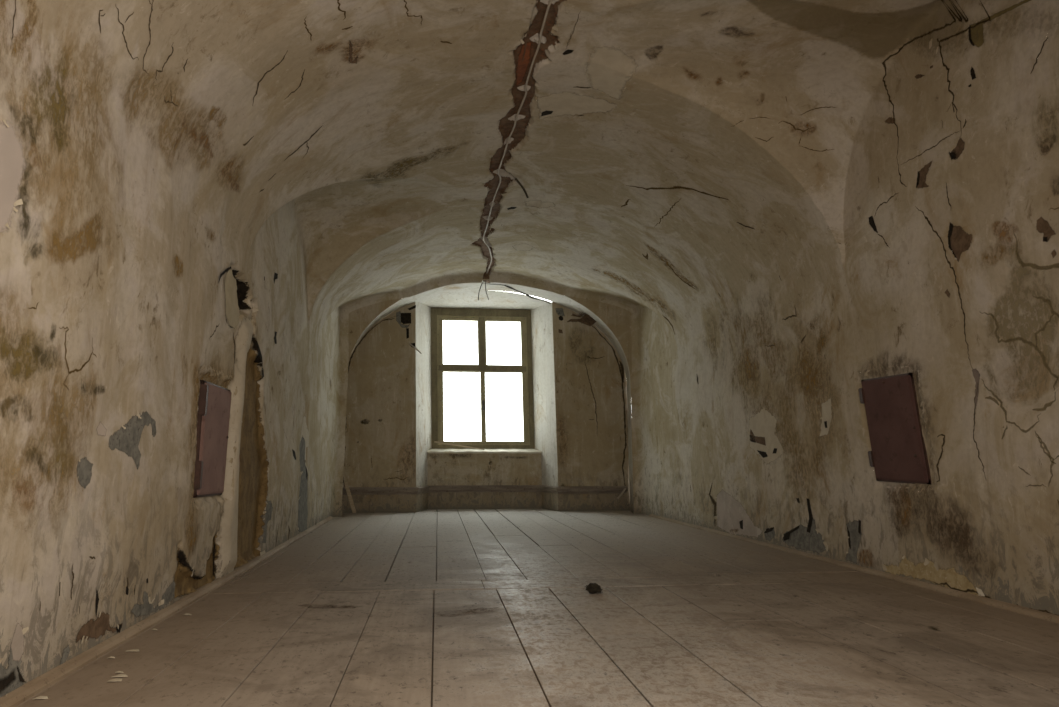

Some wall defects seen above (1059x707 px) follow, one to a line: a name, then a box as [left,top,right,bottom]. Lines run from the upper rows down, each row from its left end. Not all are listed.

crack [99,0,188,106]
peeling [0,119,25,232]
water stain [127,74,241,183]
flaking render [472,0,574,283]
flaking render [232,270,258,319]
crack [874,0,990,482]
water stain [0,297,104,506]
peeling [97,410,156,469]
flaking render [234,335,274,569]
peeling [747,406,784,464]
peeling [714,489,828,553]
crack [1018,434,1059,504]